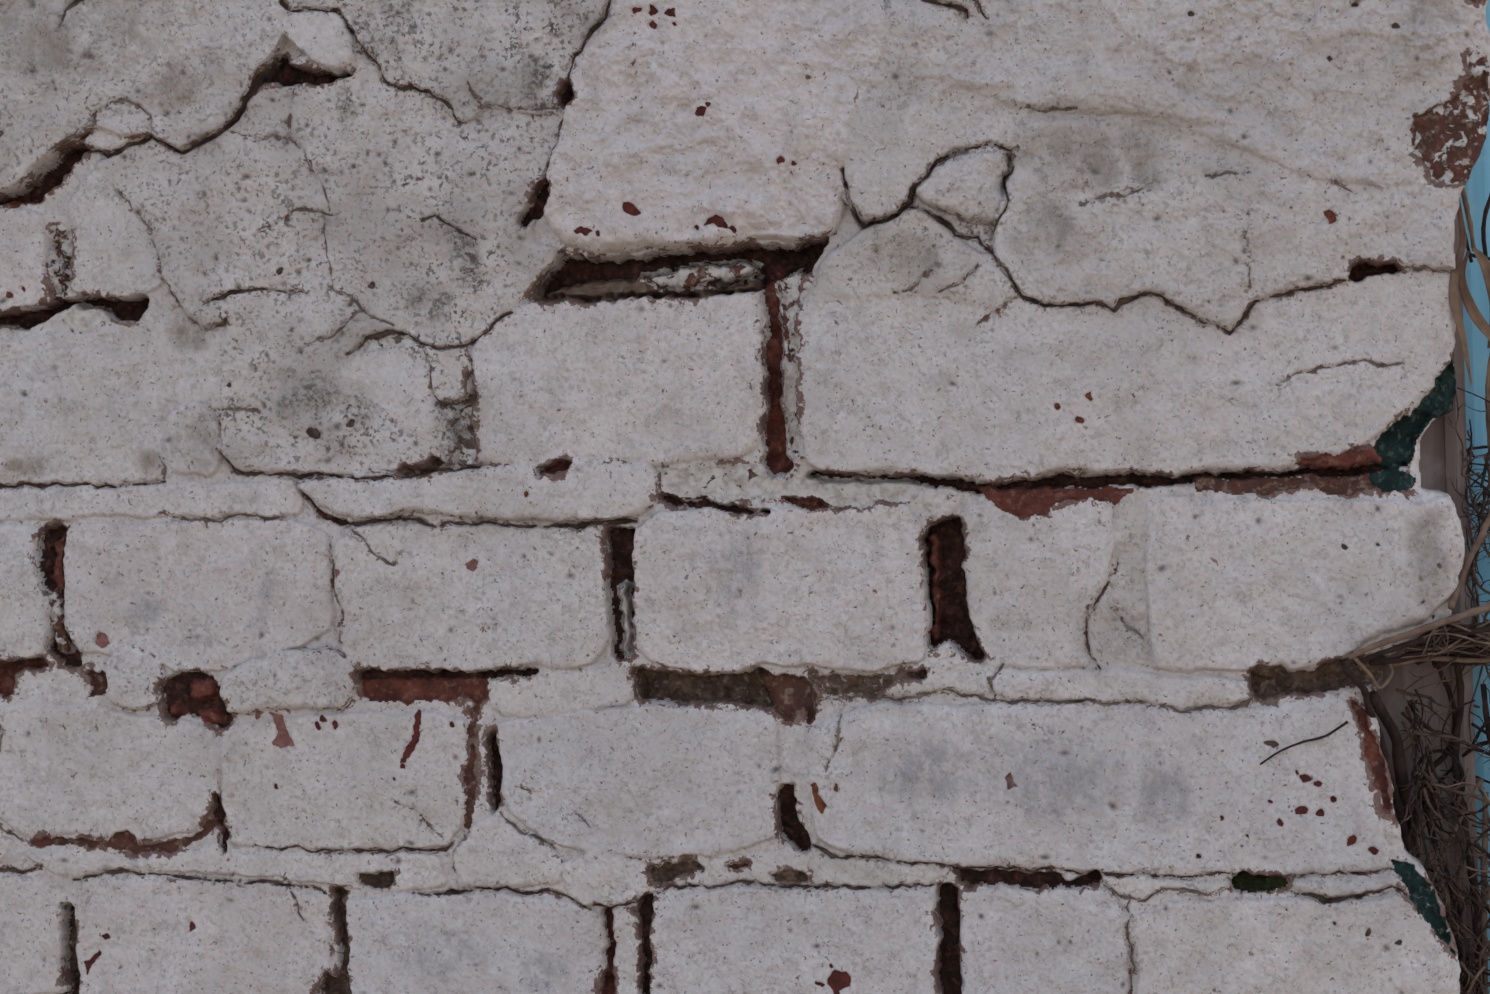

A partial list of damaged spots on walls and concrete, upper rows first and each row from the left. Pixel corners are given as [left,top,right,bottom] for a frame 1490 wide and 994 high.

crack [279,0,611,185]
spalling [1410,52,1490,186]
crack [843,144,1346,335]
crack [1404,265,1450,273]
crack [0,57,637,640]
crack [1283,359,1405,383]
spalling [971,484,1134,519]
peeling [255,711,294,748]
peeling [393,709,422,781]
spalling [761,670,818,725]
crack [825,563,1255,773]
peeling [815,963,851,994]